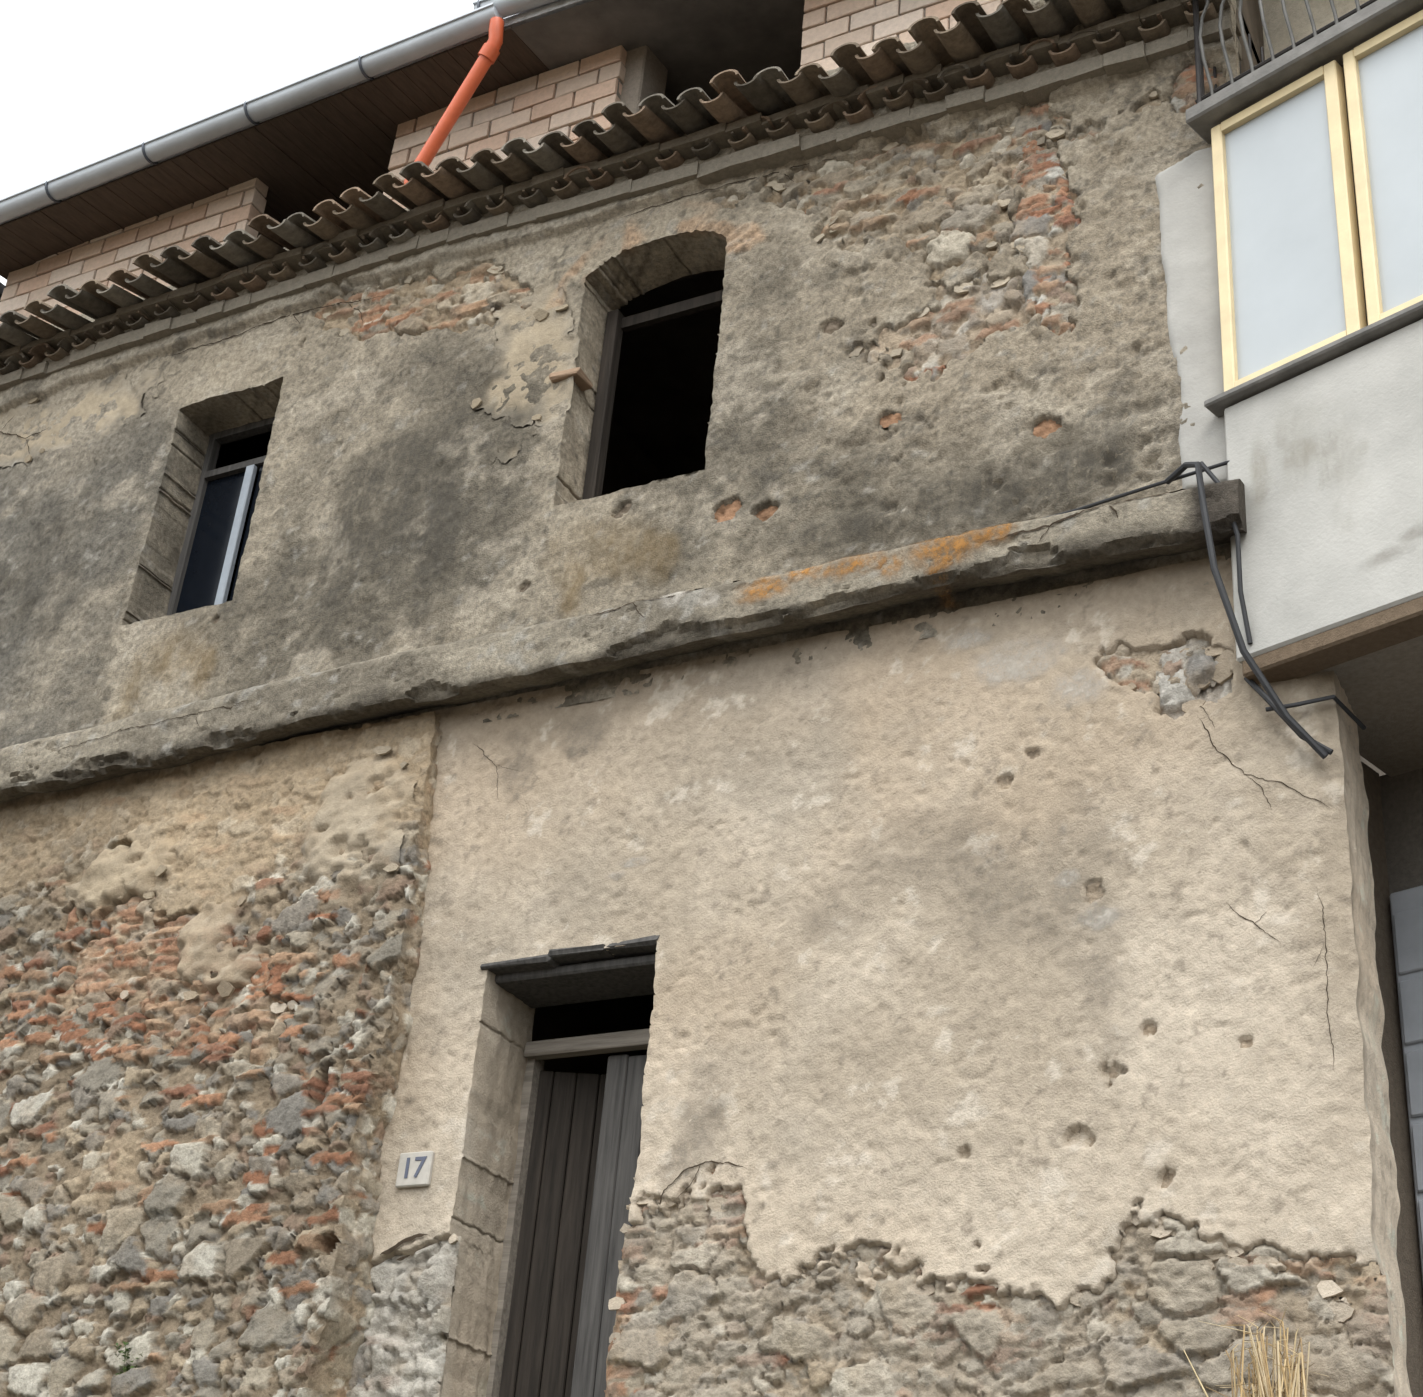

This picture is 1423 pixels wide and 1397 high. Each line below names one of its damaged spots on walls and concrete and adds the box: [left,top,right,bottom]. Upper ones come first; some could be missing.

flaking render [713,195,740,209]
flaking render [763,102,1102,382]
flaking render [315,262,580,463]
flaking render [1033,419,1062,438]
rust [916,523,1011,575]
flaking render [1096,638,1237,720]
crack [1197,706,1334,810]
peeling [383,863,400,873]
flaking render [56,865,298,1066]
flaking render [346,1233,461,1397]
flaking render [604,1168,1395,1397]